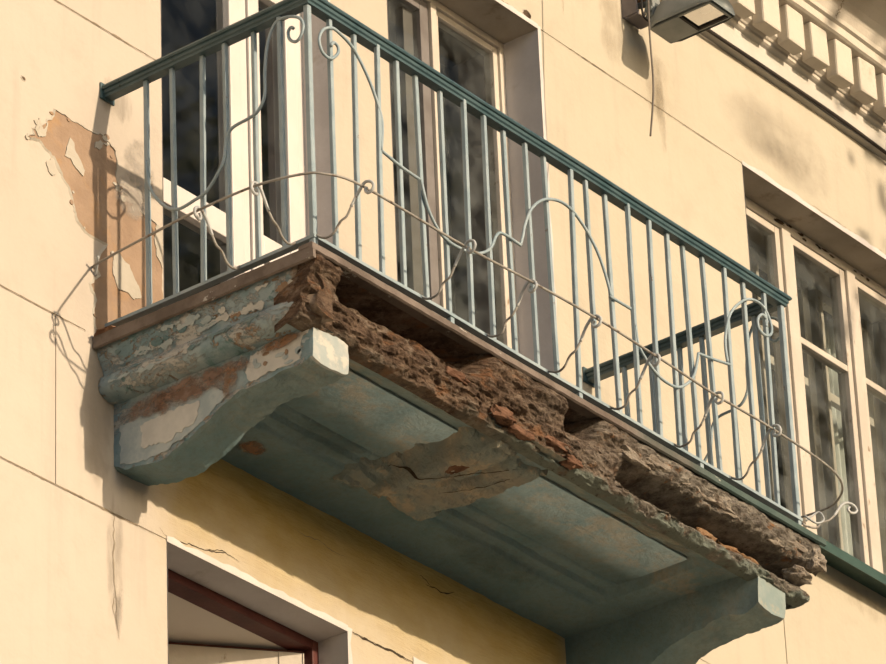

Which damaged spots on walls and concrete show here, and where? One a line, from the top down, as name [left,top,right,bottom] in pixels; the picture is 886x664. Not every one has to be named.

peeling [25,108,163,331]
crack [0,457,238,640]
crack [389,465,524,493]
spalling [108,254,827,610]